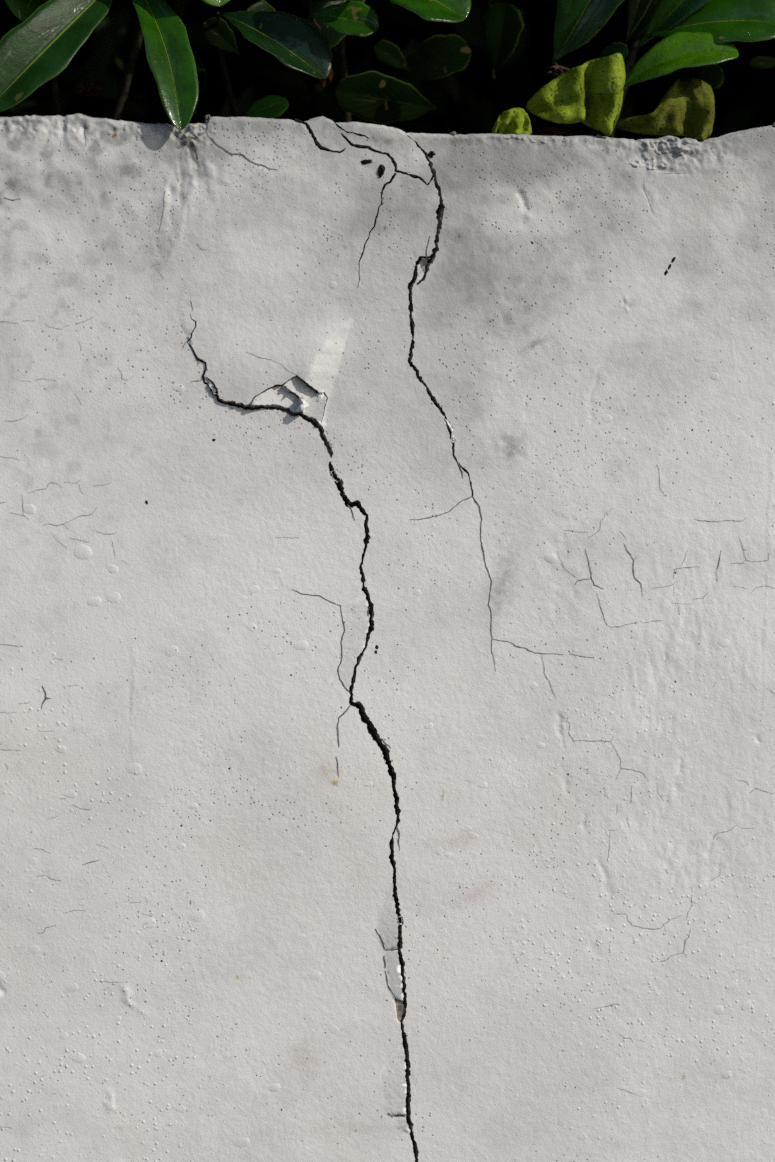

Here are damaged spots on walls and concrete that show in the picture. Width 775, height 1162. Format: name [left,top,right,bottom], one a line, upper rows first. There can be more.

crack [176,119,278,170]
spalling [251,375,327,422]
crack [295,118,663,858]
crack [183,300,419,1162]
peeling [374,887,405,1022]
peeling [379,1043,408,1132]